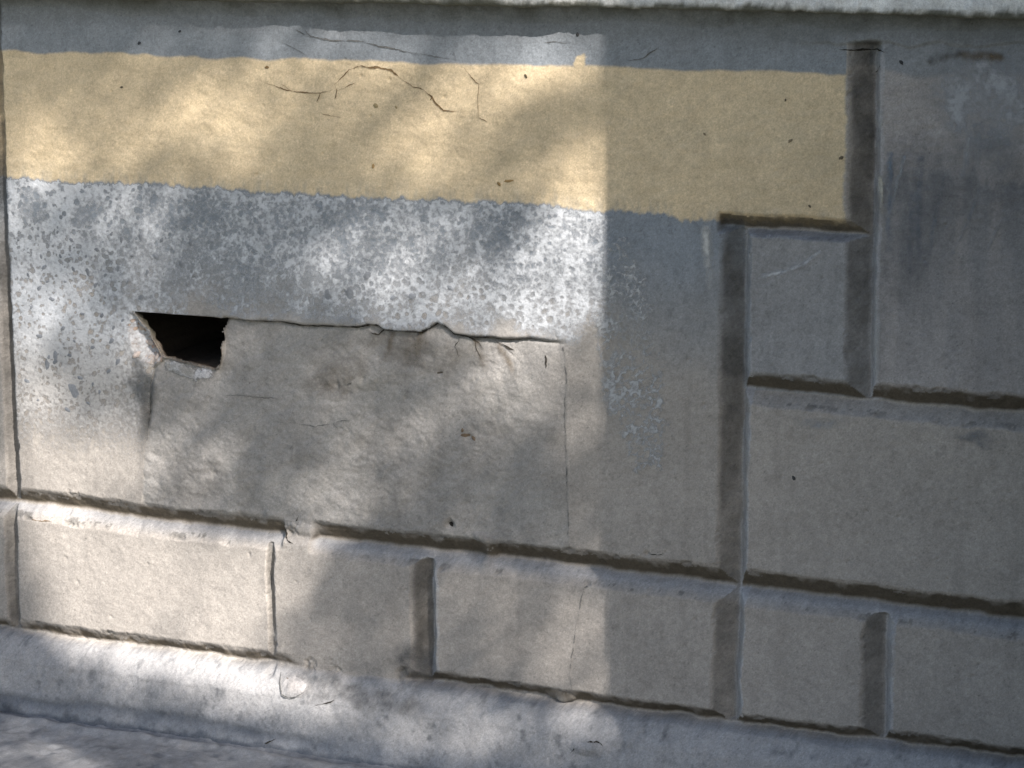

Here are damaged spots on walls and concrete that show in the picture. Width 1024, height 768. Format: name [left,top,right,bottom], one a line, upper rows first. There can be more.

crack [267,25,489,118]
peeling [6,178,607,446]
crack [228,304,569,535]